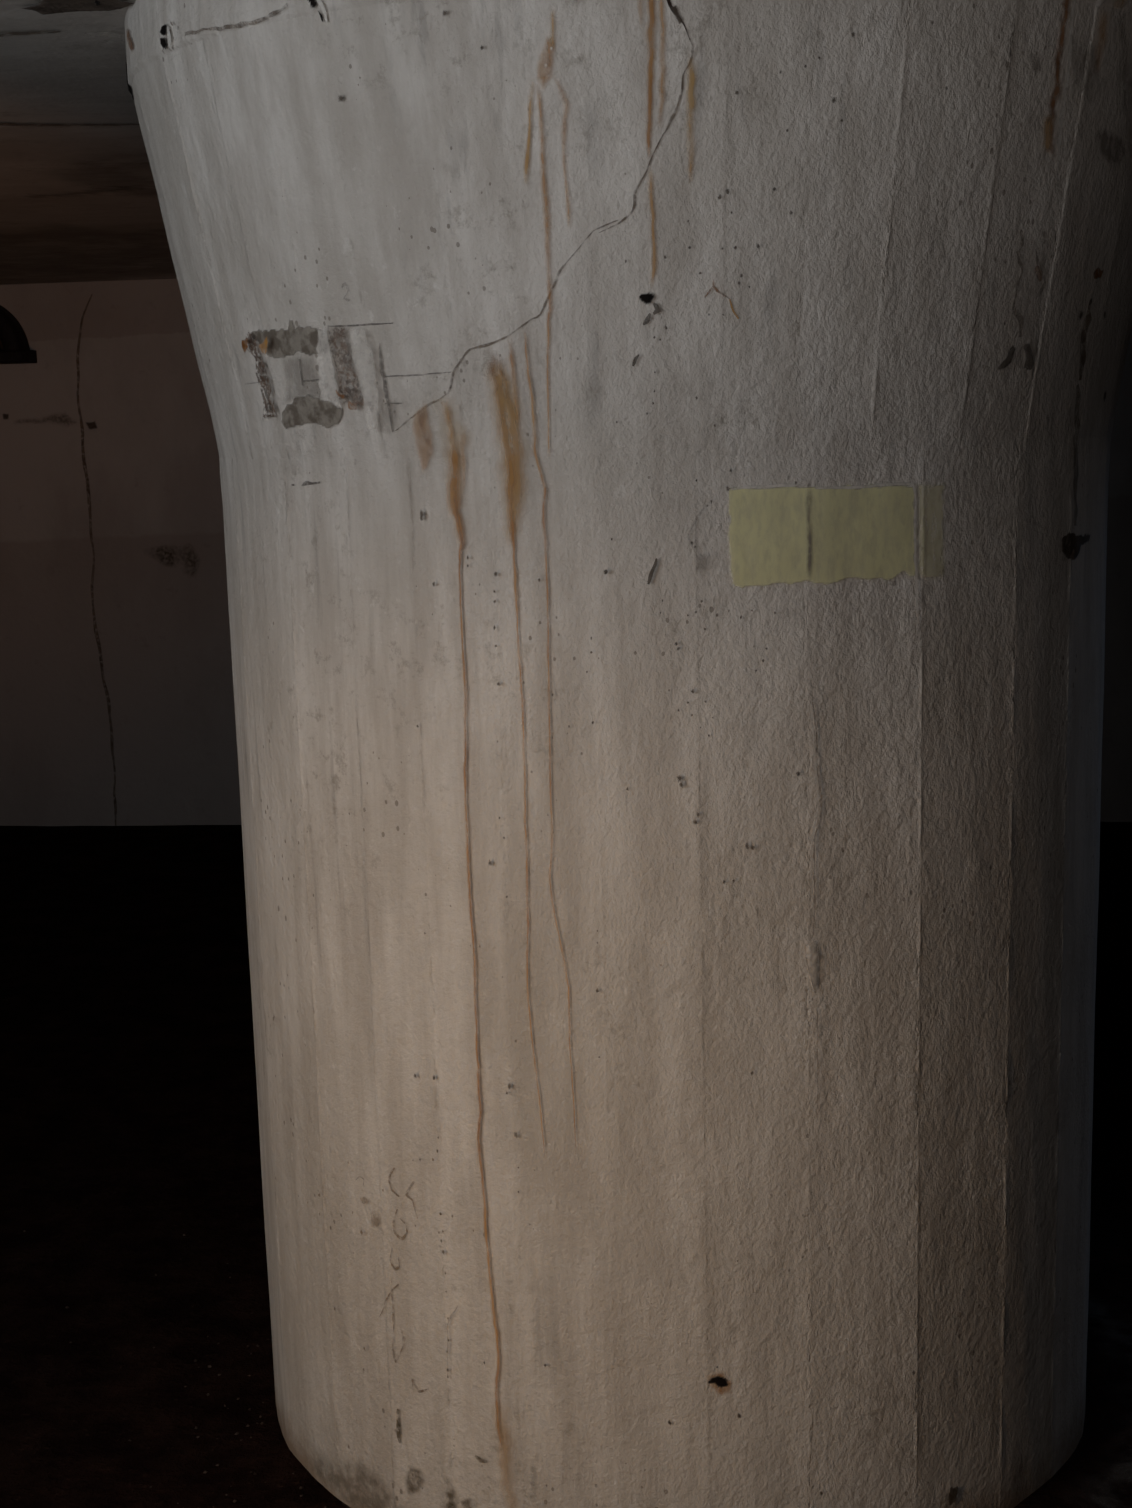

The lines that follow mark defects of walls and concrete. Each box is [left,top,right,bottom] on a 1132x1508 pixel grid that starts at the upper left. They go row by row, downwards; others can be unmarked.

crack [76,294,117,826]
spalling [242,321,377,429]
rust [490,287,552,839]
rust [525,15,554,256]
crack [395,0,693,431]
rust [647,0,664,150]
rust [447,411,501,1444]